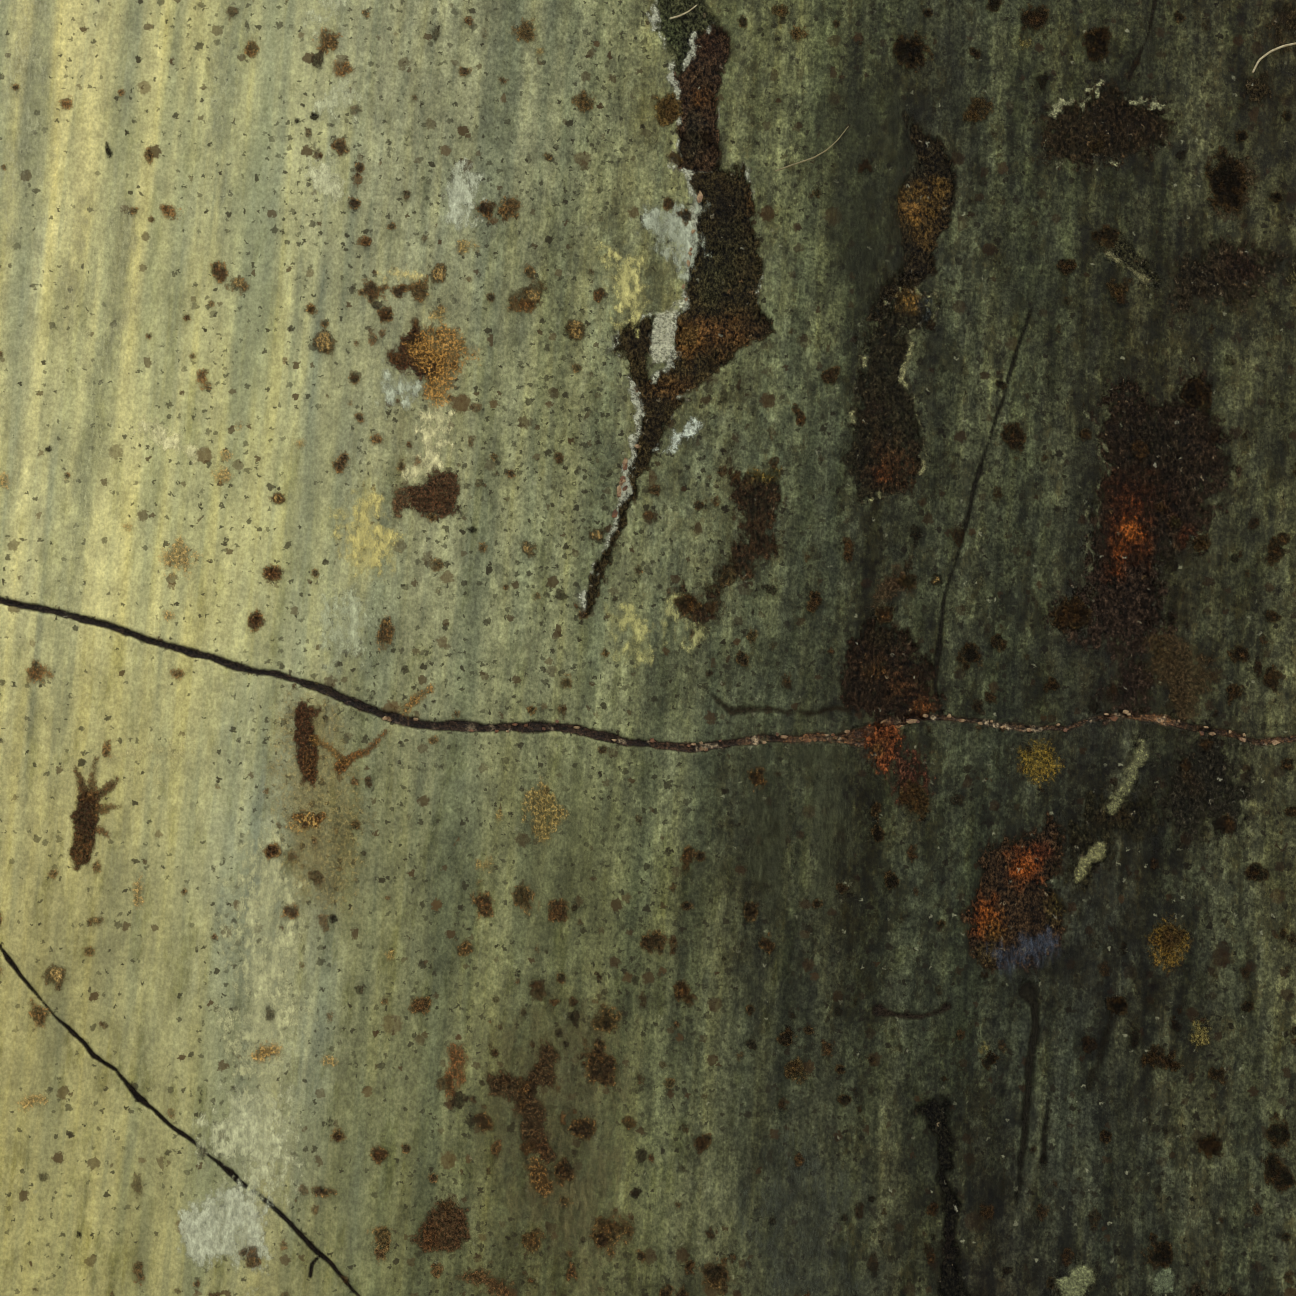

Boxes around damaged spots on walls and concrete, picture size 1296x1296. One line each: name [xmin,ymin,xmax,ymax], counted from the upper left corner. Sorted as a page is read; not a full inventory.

corrosion [306,240,478,406]
spalling [579,0,775,615]
spalling [840,112,957,504]
corrosion [348,371,382,444]
corrosion [534,588,588,619]
crack [0,309,1296,753]
spalling [667,457,787,642]
corrosion [49,740,119,879]
corrosion [292,684,387,788]
corrosion [864,722,930,821]
crack [0,945,360,1296]
corrosion [238,1246,261,1268]